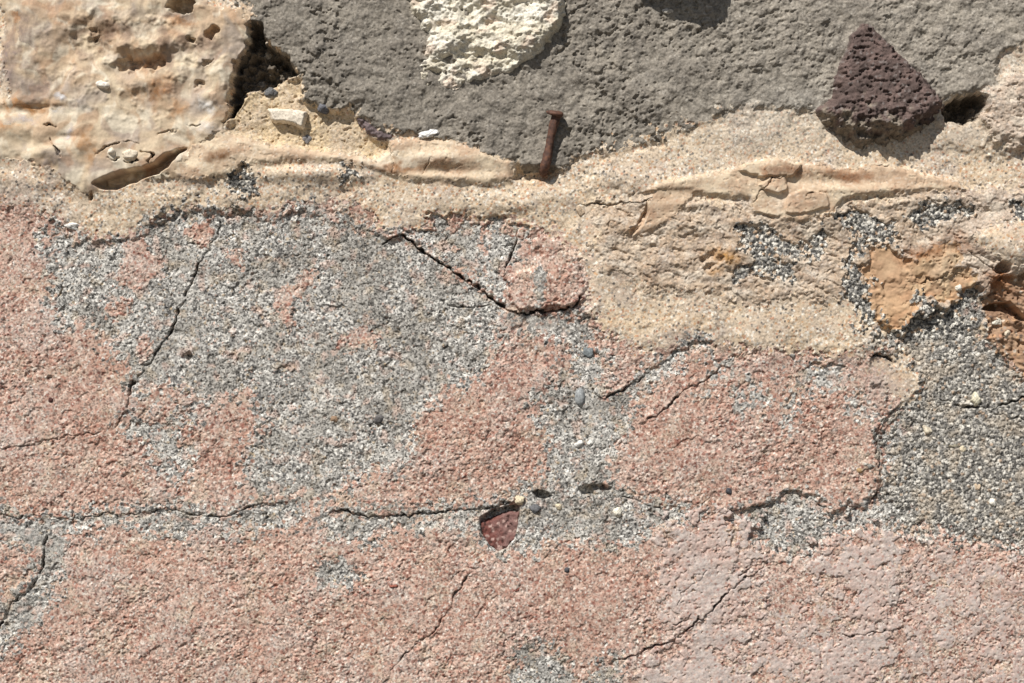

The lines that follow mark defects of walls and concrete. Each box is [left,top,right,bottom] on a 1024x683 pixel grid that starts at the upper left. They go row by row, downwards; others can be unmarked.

spalling [221,19,302,124]
spalling [267,108,308,130]
spalling [355,114,392,141]
spalling [941,91,992,128]
crack [383,230,583,316]
crack [0,221,221,451]
spalling [0,158,1024,683]
crack [592,372,649,400]
crack [640,352,743,426]
crack [0,465,270,630]
crack [320,489,523,521]
crack [383,560,482,683]